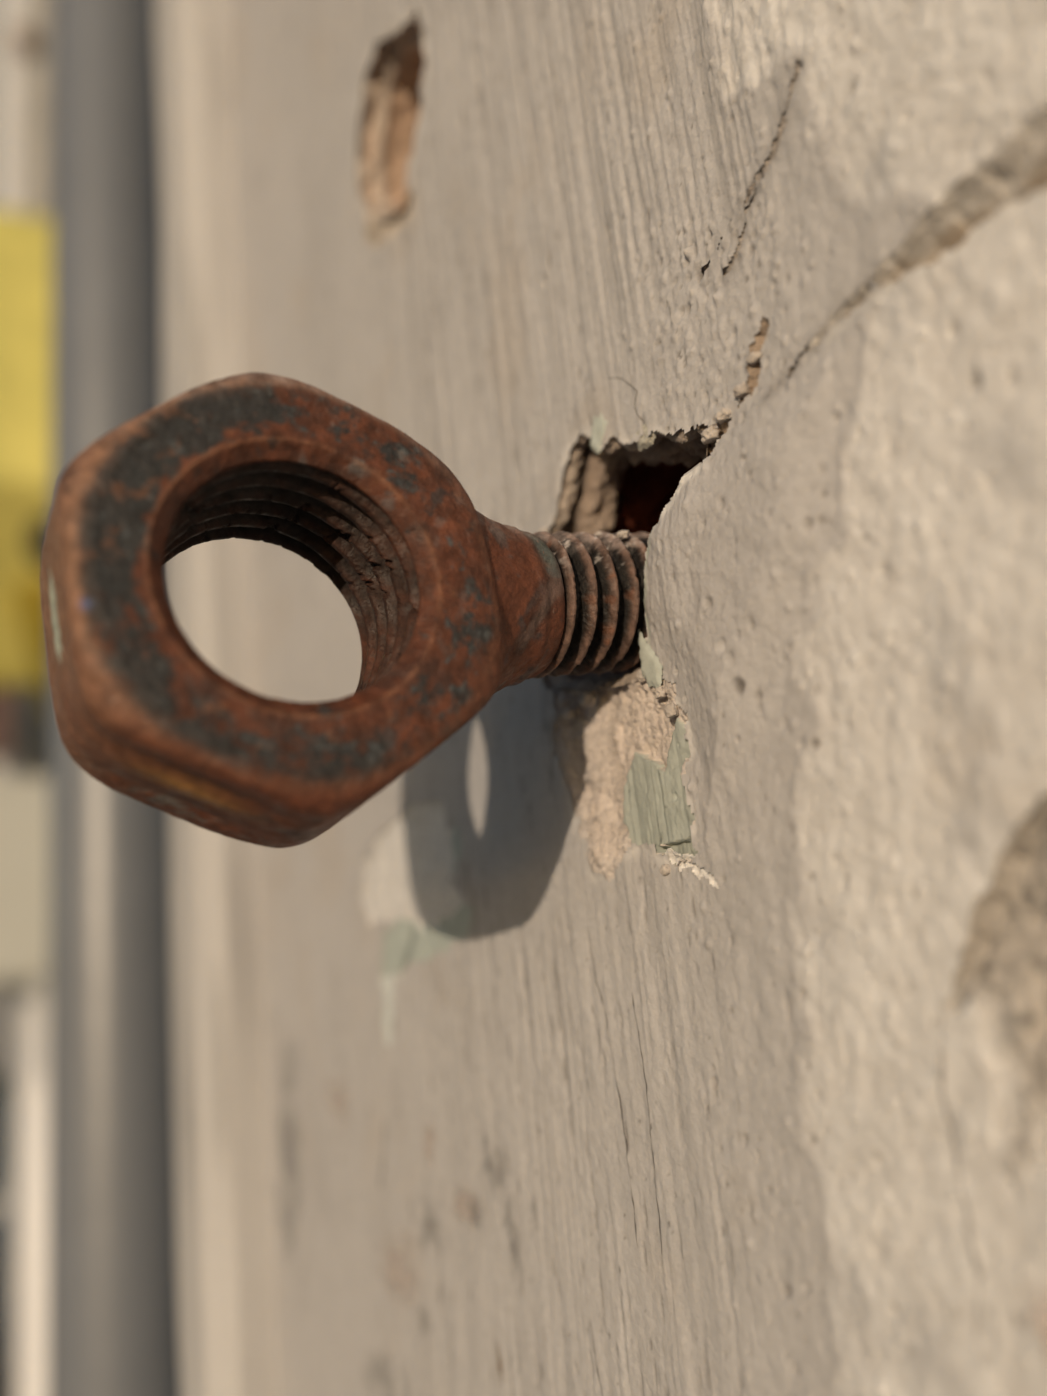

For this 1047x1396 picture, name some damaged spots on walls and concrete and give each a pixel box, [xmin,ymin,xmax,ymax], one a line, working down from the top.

crack [700,59,804,277]
spalling [539,316,770,540]
crack [788,279,876,378]
flaking render [542,629,720,889]
flaking render [943,795,1047,1210]